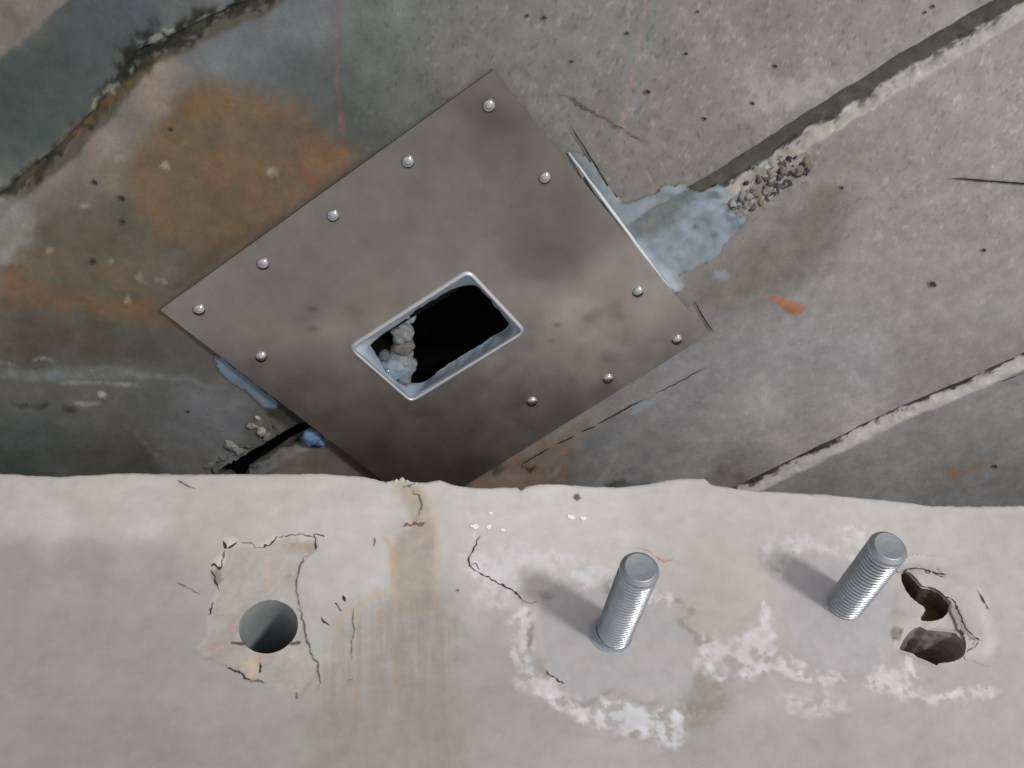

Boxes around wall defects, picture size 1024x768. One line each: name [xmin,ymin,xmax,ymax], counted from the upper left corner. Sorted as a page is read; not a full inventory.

rust [0,64,374,338]
spalling [727,147,819,219]
spalling [193,532,325,701]
crack [468,536,538,606]
hole [901,572,949,631]